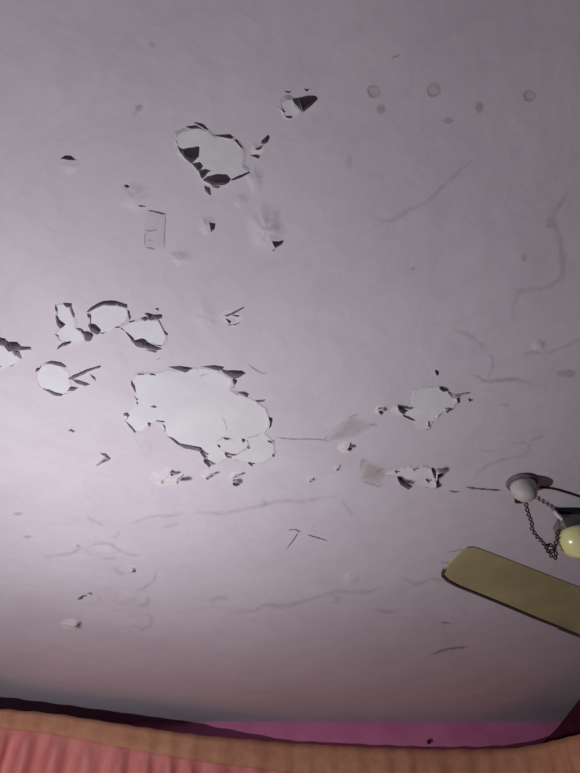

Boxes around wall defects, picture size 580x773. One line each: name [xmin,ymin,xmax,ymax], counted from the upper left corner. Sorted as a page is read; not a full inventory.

peeling [278,92,318,120]
peeling [173,123,268,196]
peeling [54,302,168,353]
peeling [220,308,243,327]
peeling [0,340,32,370]
peeling [35,362,100,396]
peeling [374,371,473,431]
peeling [123,366,276,487]
peeling [385,465,448,490]